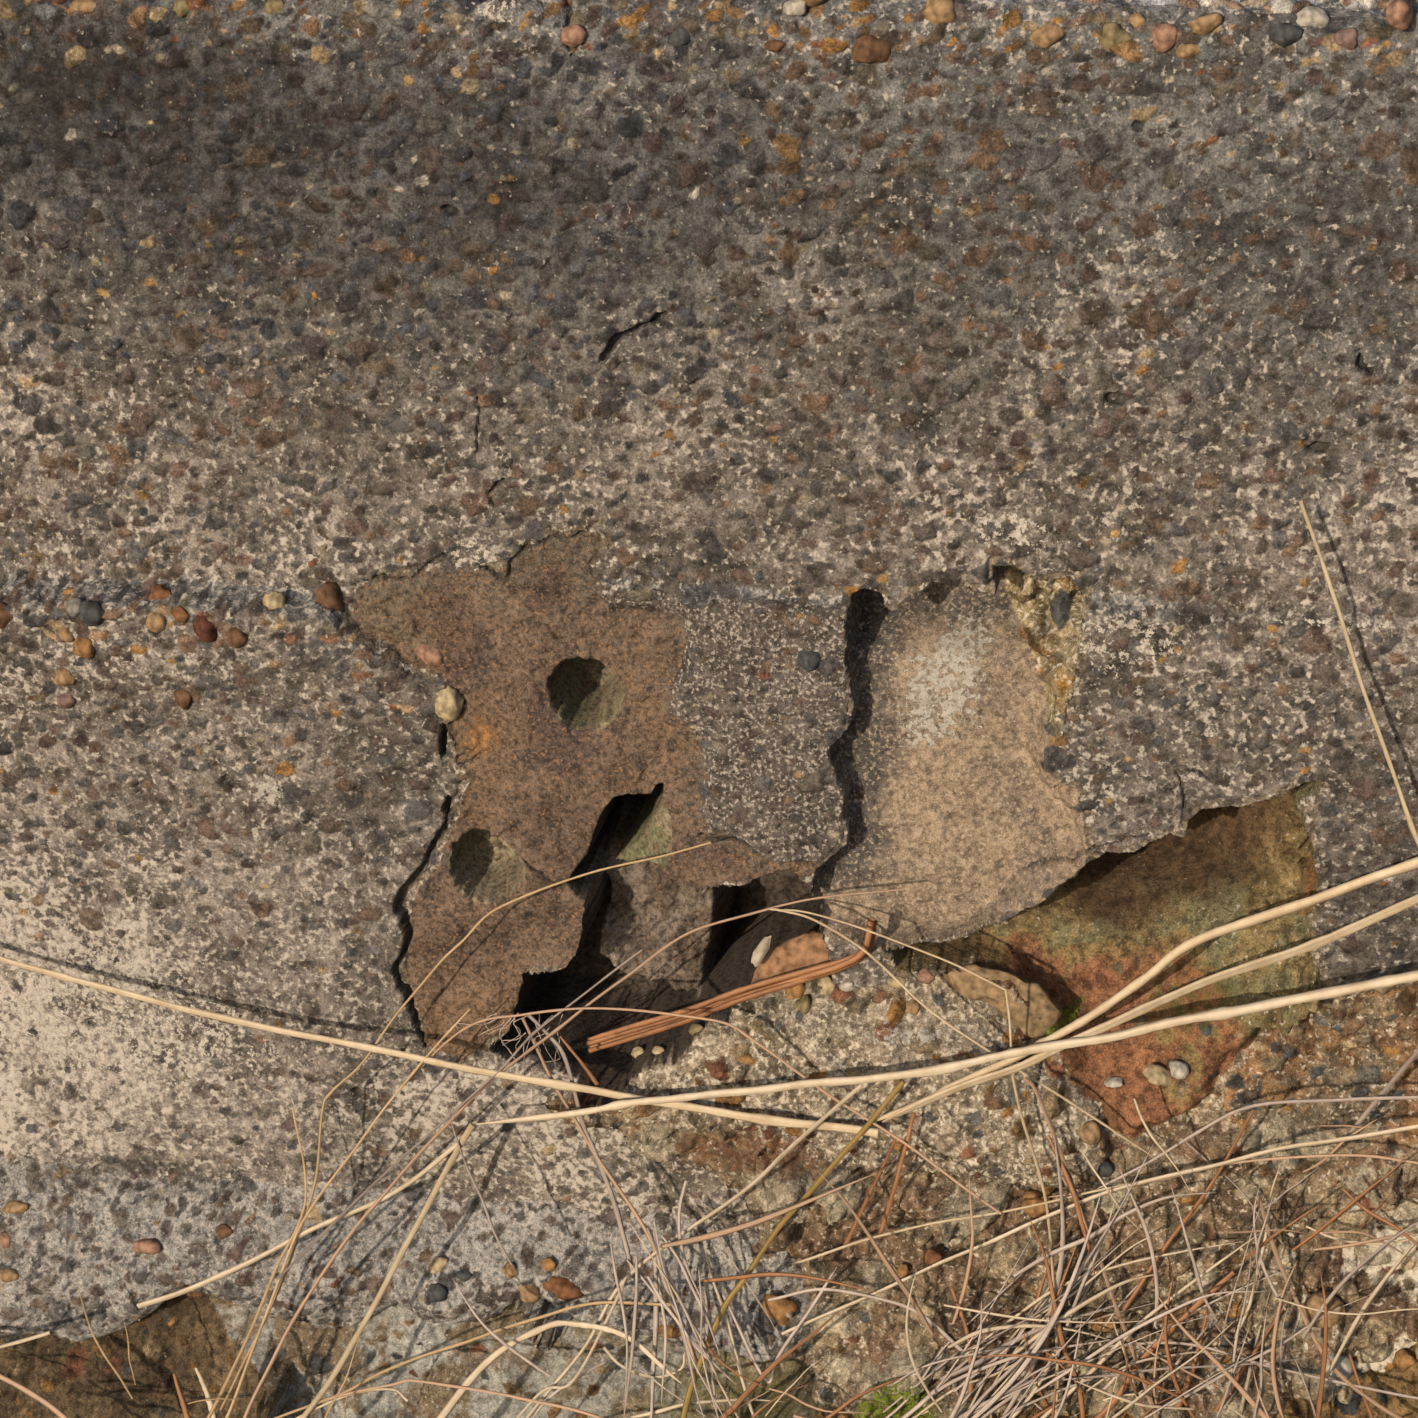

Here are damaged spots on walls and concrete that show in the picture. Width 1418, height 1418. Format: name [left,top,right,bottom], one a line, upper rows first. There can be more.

crack [600,311,668,361]
crack [393,748,490,1034]
spalling [339,516,1335,1139]